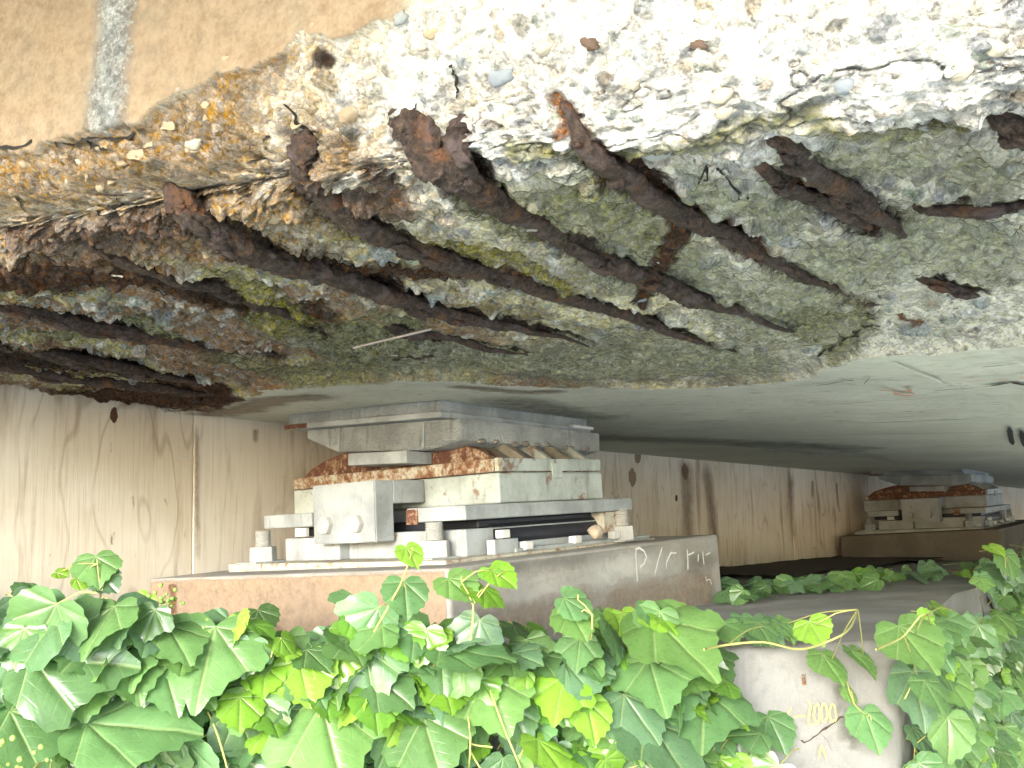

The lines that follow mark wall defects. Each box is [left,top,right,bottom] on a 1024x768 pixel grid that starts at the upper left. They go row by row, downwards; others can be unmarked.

corrosion [910,118,956,130]
corrosion [985,112,1024,152]
corrosion [0,0,879,416]
spalling [0,0,1024,400]
corrosion [754,135,1024,239]
corrosion [915,273,990,300]